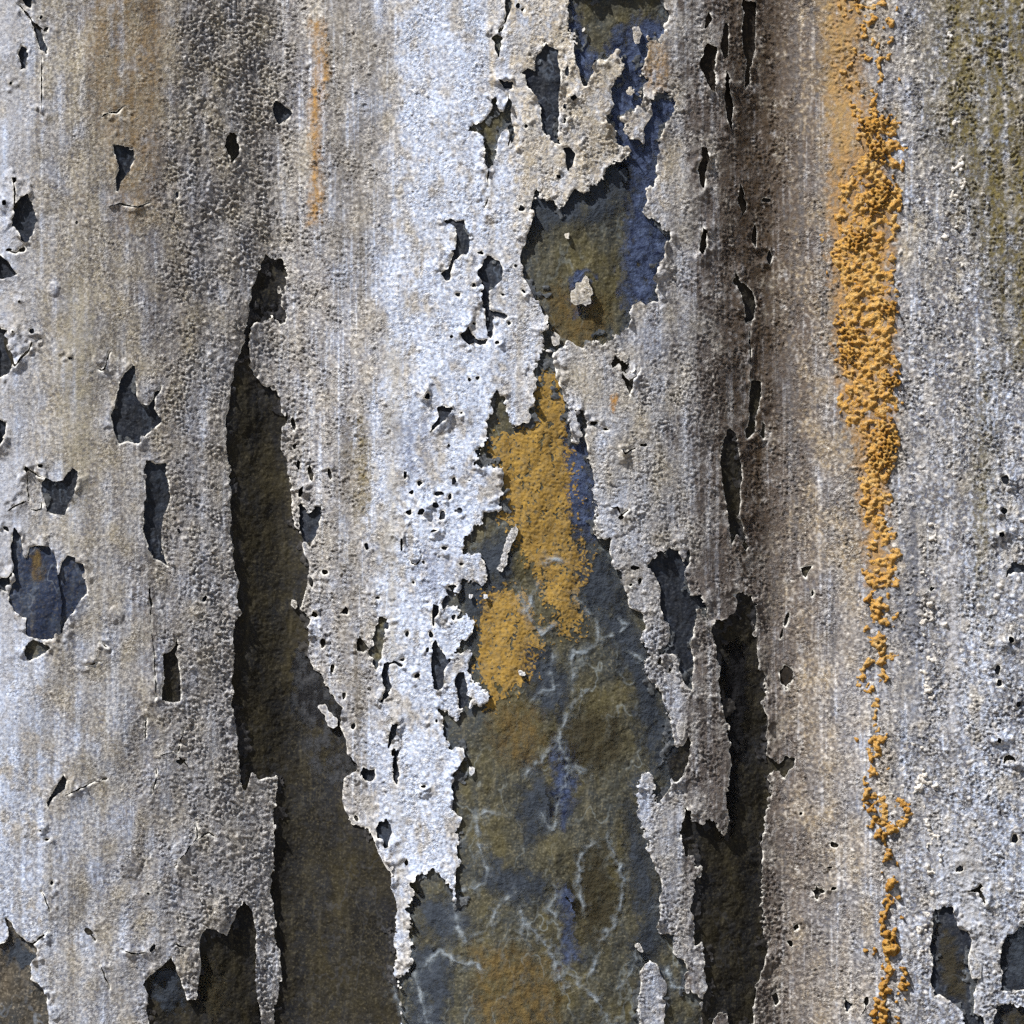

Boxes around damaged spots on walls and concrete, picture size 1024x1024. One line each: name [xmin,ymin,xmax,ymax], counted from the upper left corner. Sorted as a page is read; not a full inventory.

peeling [111,365,162,444]
peeling [142,0,795,1024]
rust [819,0,914,1024]
peeling [0,526,87,660]
peeling [929,906,1024,1024]